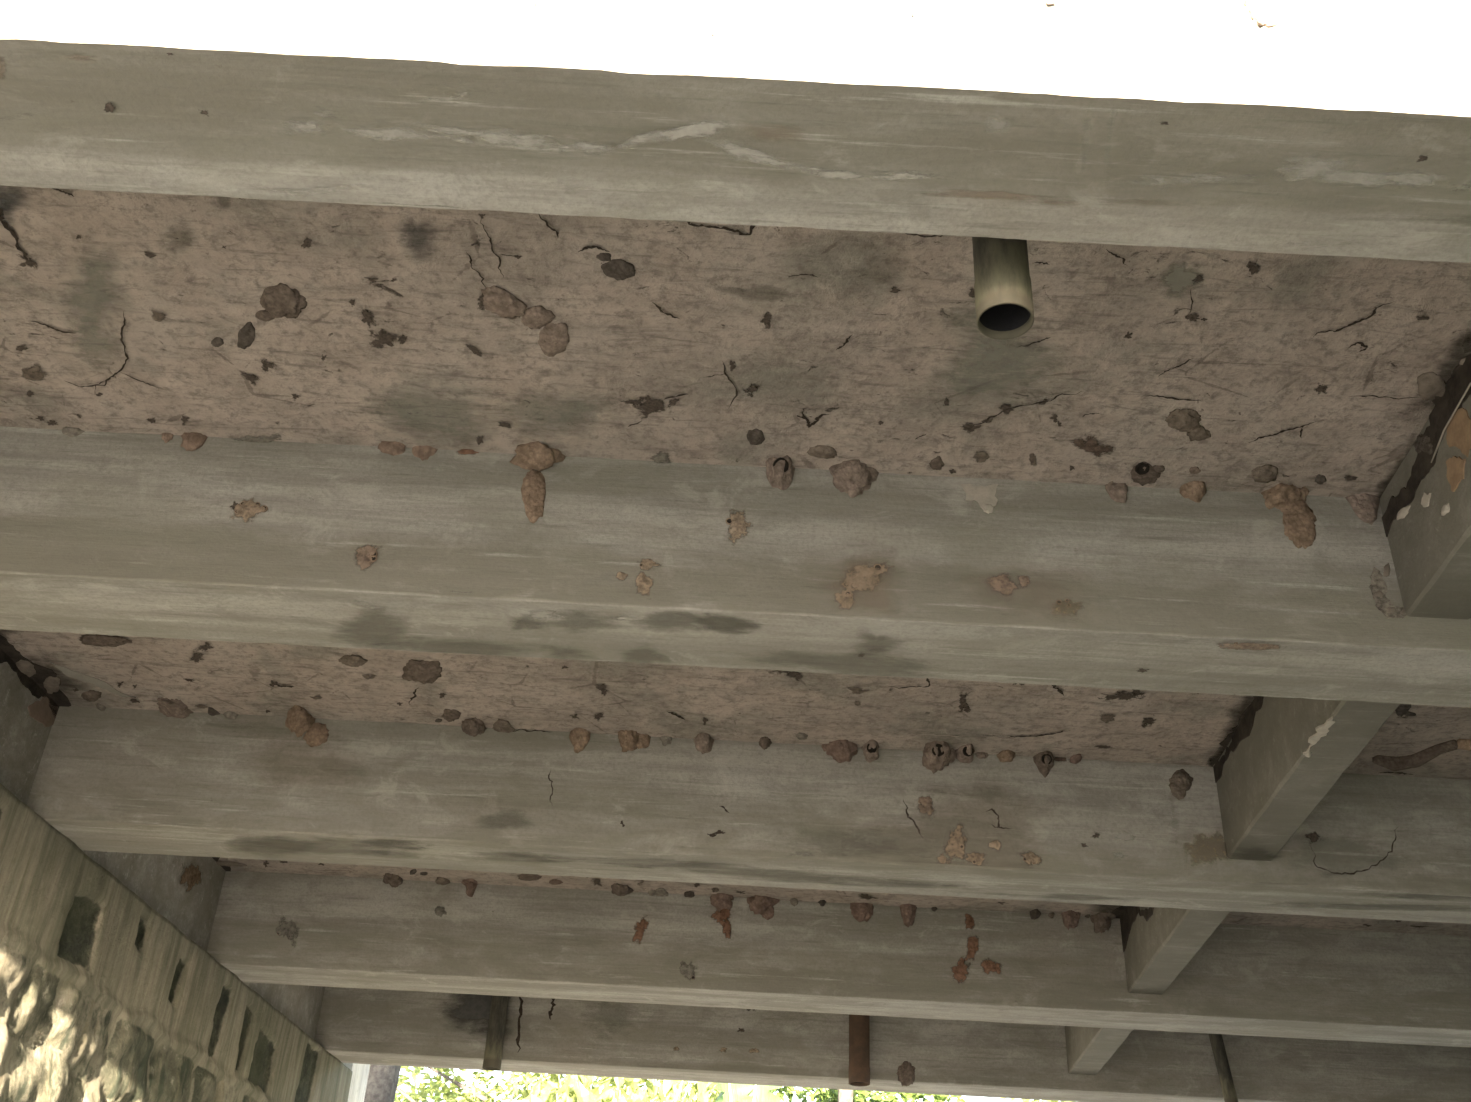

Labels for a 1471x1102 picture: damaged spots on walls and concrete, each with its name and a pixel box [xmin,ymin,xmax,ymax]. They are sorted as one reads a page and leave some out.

crack [0,208,32,268]
crack [688,222,755,235]
crack [905,231,944,239]
crack [66,312,160,390]
crack [967,391,1099,431]
spalling [0,635,140,727]
damp [240,839,402,855]
crack [1310,827,1398,875]
damp [444,994,492,1033]